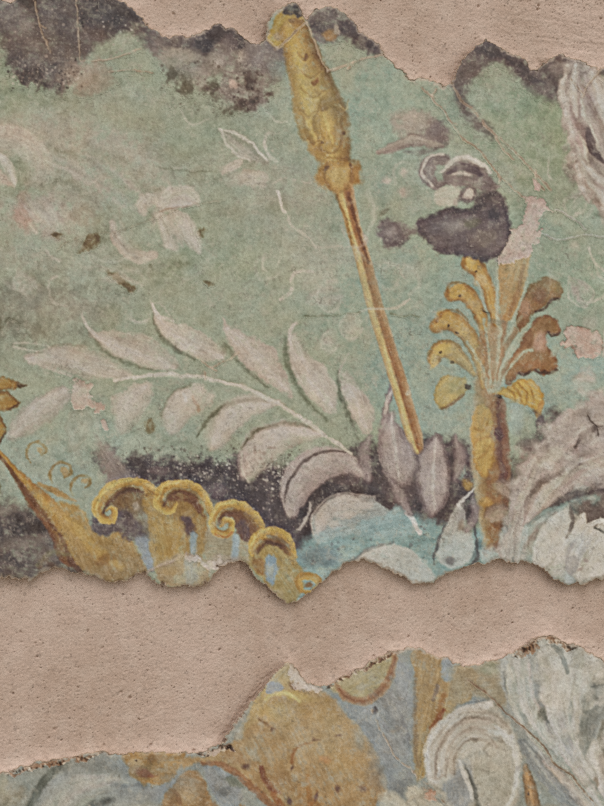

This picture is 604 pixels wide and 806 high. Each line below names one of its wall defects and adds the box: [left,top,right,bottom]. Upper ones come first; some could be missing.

flaking render [497,177,557,266]
flaking render [559,324,604,360]
flaking render [68,376,109,432]
flaking render [184,550,237,571]
spalling [512,635,579,660]
flaking render [287,650,399,694]
spalling [3,751,105,779]
spalling [196,742,236,757]
crack [466,679,598,806]